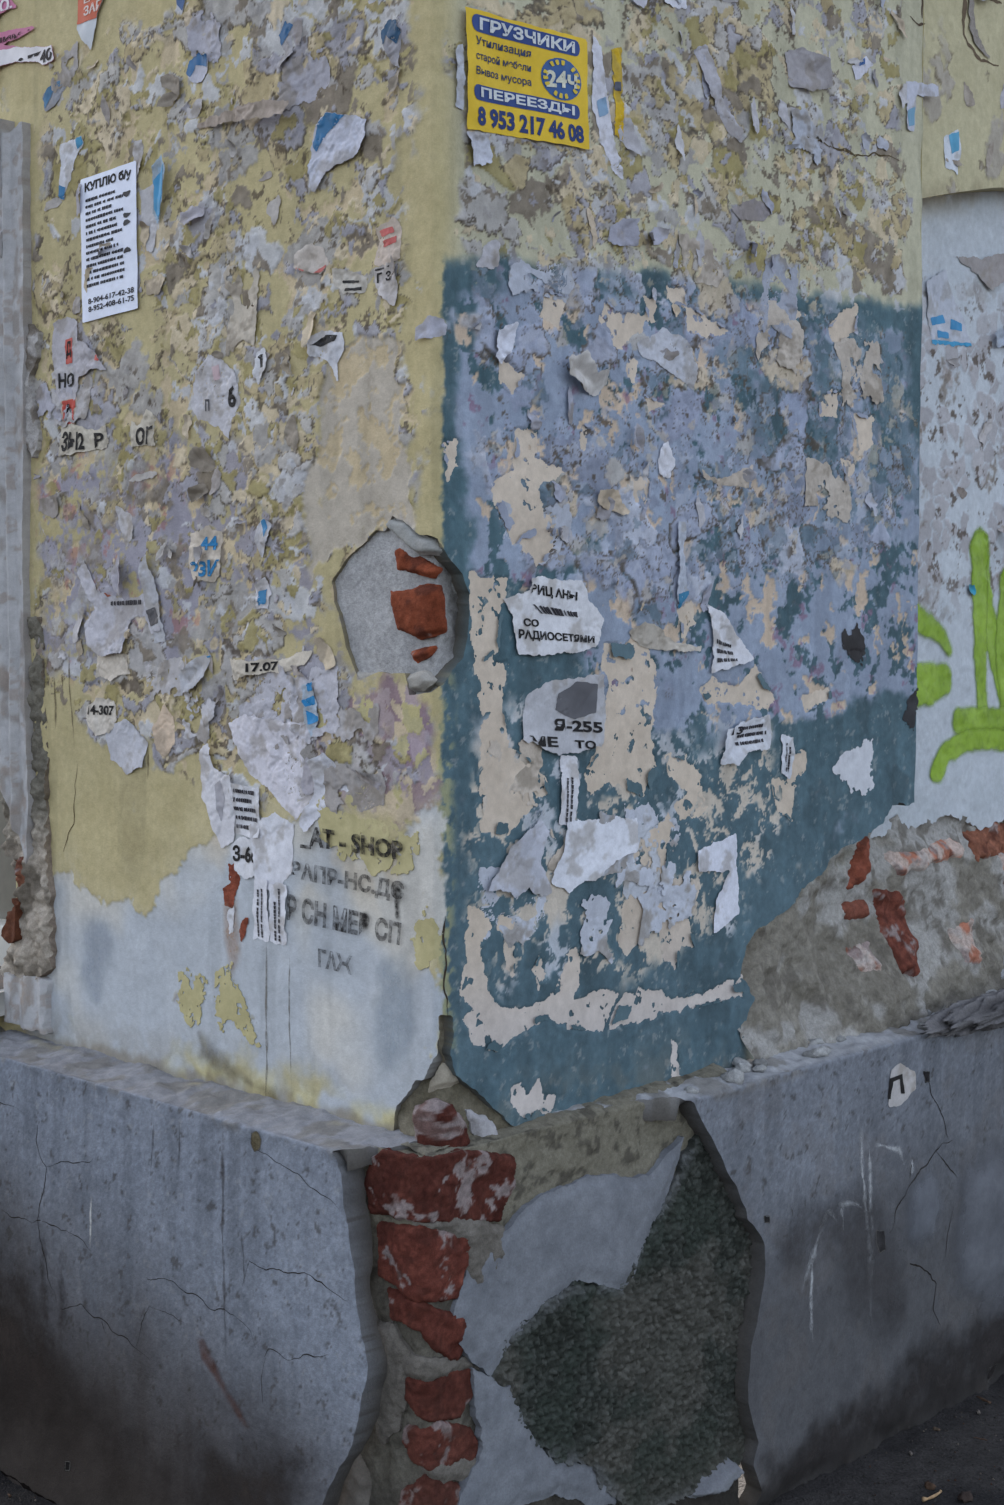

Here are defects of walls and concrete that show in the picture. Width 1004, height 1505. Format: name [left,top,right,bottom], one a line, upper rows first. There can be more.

peeling [491,428,564,567]
peeling [598,285,728,413]
peeling [818,389,874,482]
spalling [0,616,57,980]
peeling [316,795,420,876]
spalling [335,517,550,836]
peeling [584,642,708,970]
spalling [459,814,1004,1060]
peeling [699,664,775,710]
peeling [771,749,807,821]
crack [0,1102,340,1404]
spalling [338,1015,753,1505]